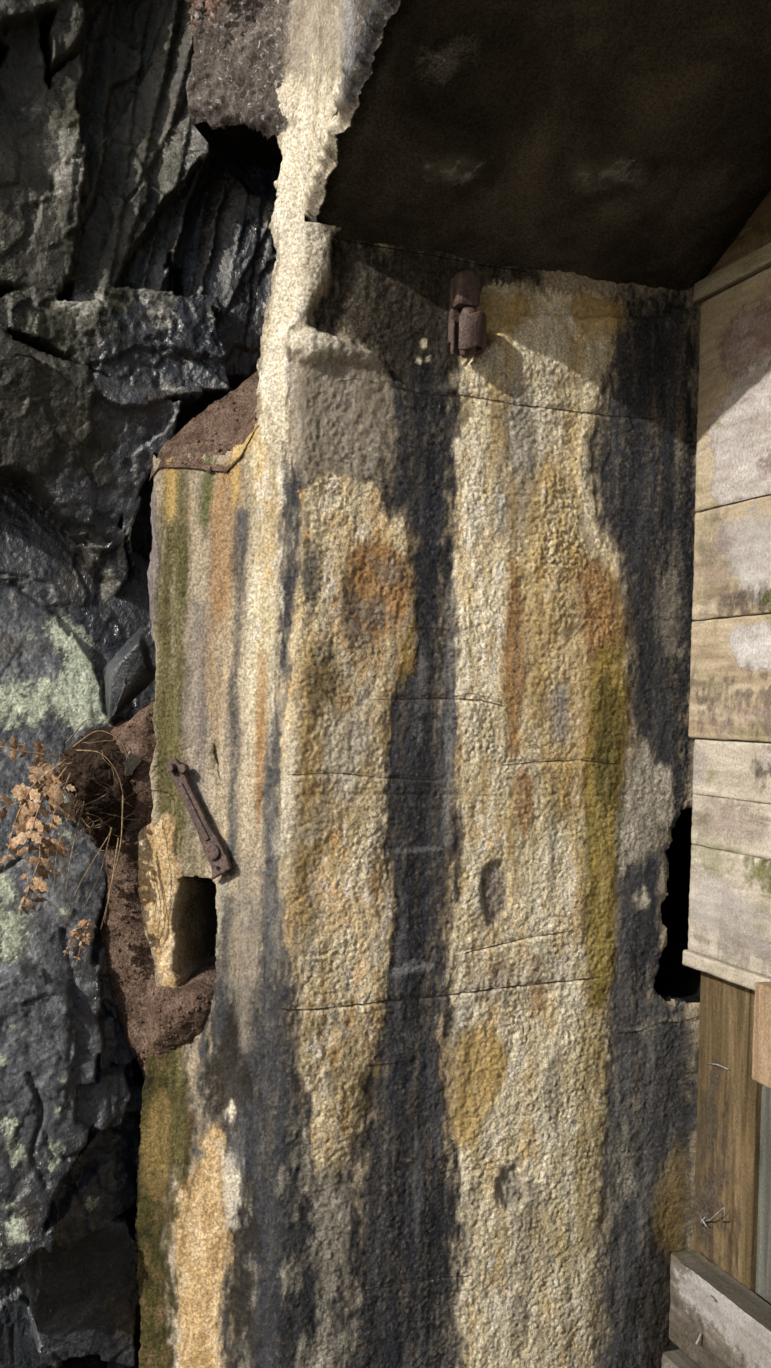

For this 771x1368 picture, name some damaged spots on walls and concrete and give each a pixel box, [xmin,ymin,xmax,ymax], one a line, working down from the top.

leakage [147,467,176,655]
leakage [167,0,744,1368]
leakage [719,591,770,615]
leakage [138,814,198,988]
crack [277,929,601,1011]